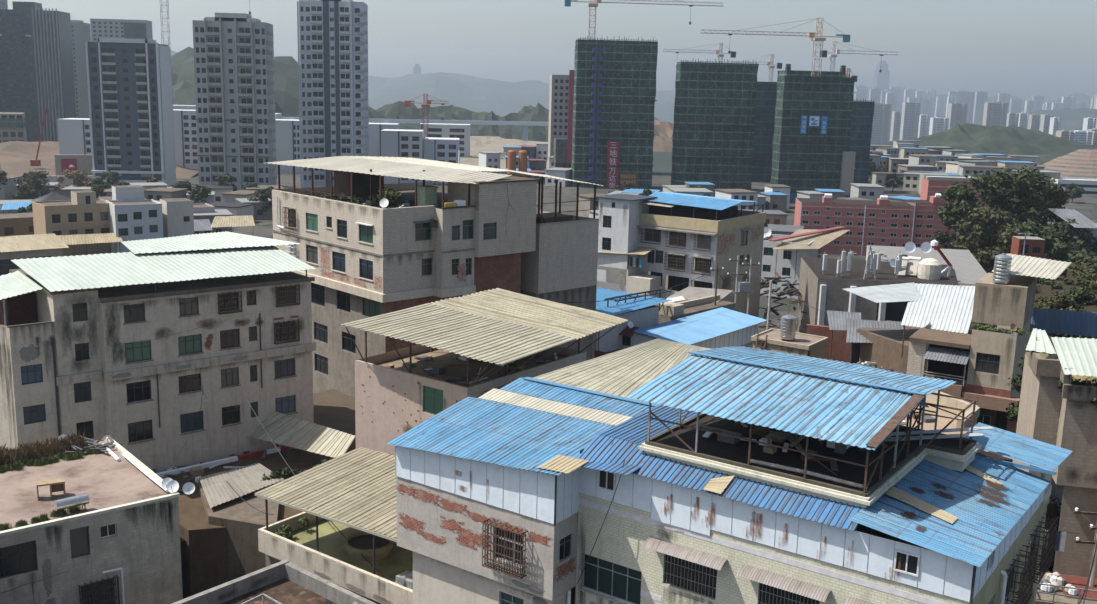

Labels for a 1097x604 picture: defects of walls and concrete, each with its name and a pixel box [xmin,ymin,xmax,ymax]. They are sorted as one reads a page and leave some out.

corrosion [911,483,954,499]
corrosion [978,480,1011,507]
flaking render [397,482,551,551]
corrosion [691,497,715,526]
corrosion [901,511,927,531]